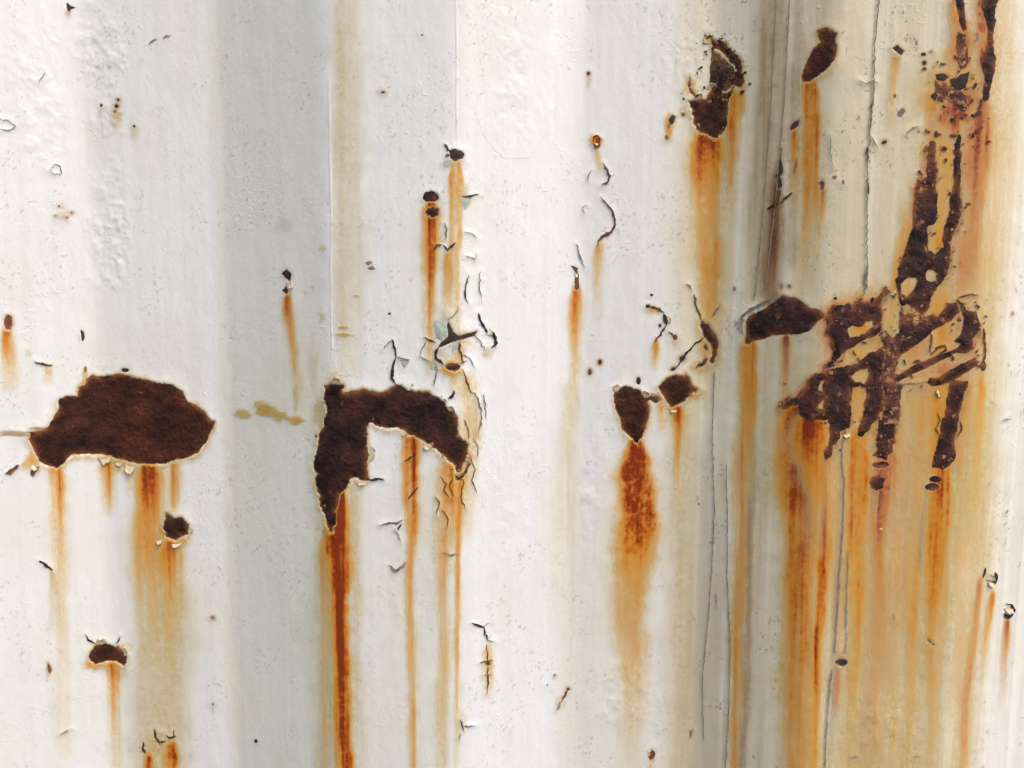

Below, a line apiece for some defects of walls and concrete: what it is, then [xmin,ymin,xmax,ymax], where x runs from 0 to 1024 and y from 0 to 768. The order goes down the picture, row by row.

corrosion [86,636,128,729]
corrosion [5,366,215,651]
corrosion [313,377,470,768]
corrosion [421,144,479,351]
corrosion [569,244,584,356]
corrosion [613,20,767,681]
corrosion [739,0,998,768]
corrosion [956,568,1016,768]